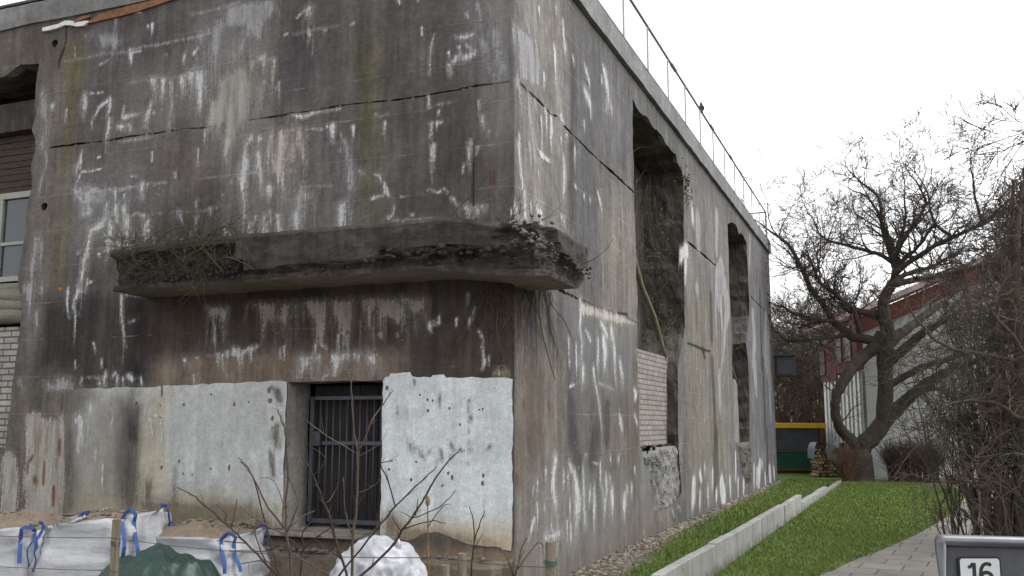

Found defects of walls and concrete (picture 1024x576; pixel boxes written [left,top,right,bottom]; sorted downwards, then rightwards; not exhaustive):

efflorescence [72,1,323,234]
efflorescence [320,123,361,226]
crack [49,81,634,192]
spalling [508,219,592,279]
efflorescence [99,360,142,385]
efflorescence [208,307,257,365]
water stain [247,297,440,380]
water stain [529,299,637,553]
corrosion [27,455,55,506]
spalling [643,446,683,523]